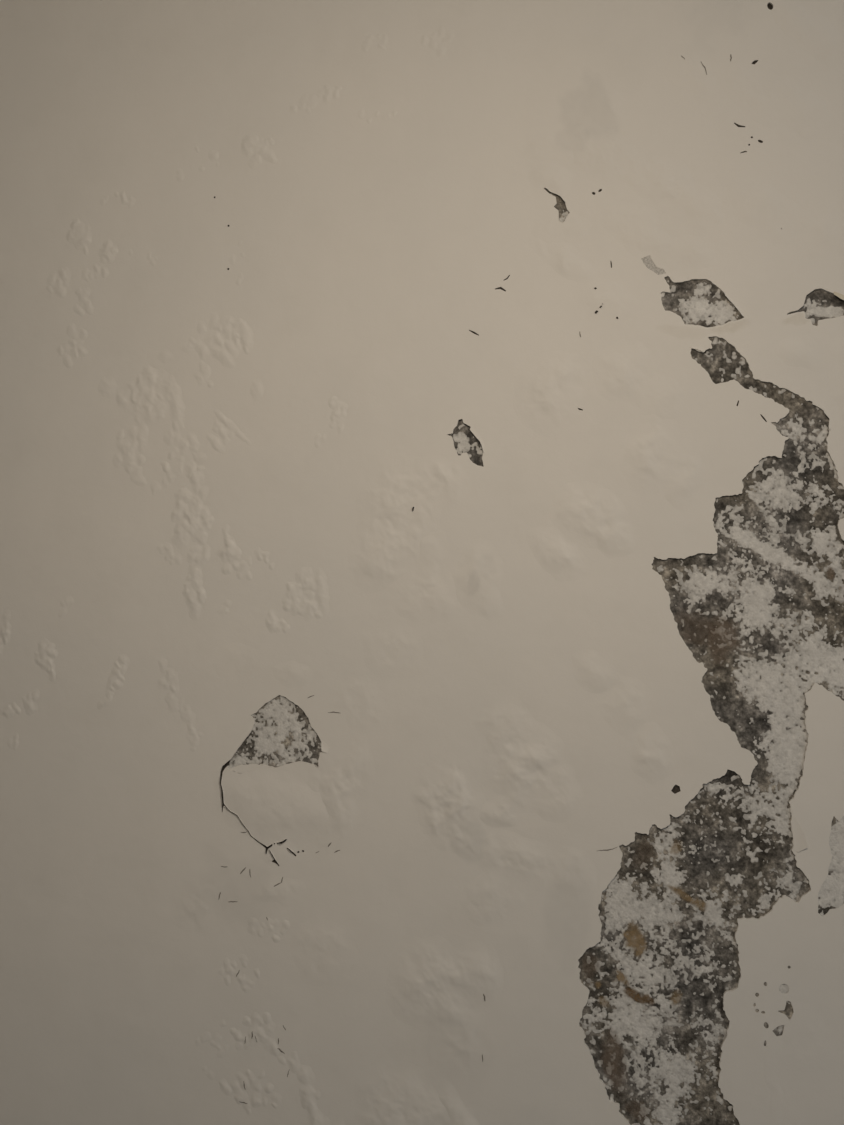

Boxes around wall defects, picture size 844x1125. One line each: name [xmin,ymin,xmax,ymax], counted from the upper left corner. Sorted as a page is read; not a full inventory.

spalling [545,189,569,223]
spalling [449,420,484,466]
spalling [578,256,844,1125]
spalling [228,695,329,773]
crack [218,760,340,902]